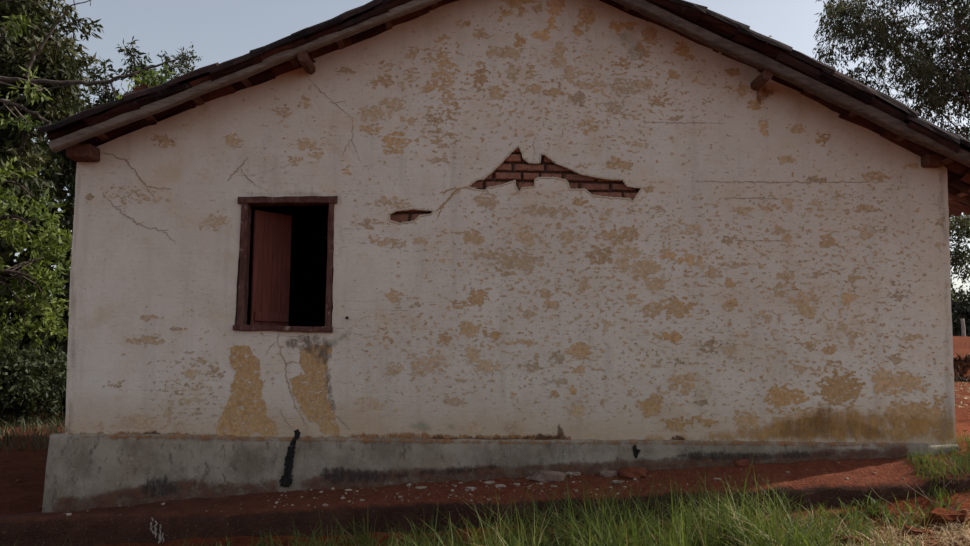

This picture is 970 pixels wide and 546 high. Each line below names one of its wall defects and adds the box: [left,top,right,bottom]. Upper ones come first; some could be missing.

crack [100,153,170,198]
crack [103,193,174,241]
crack [434,186,477,219]
peeling [68,0,954,458]
damp [711,409,954,442]
damp [678,452,829,460]